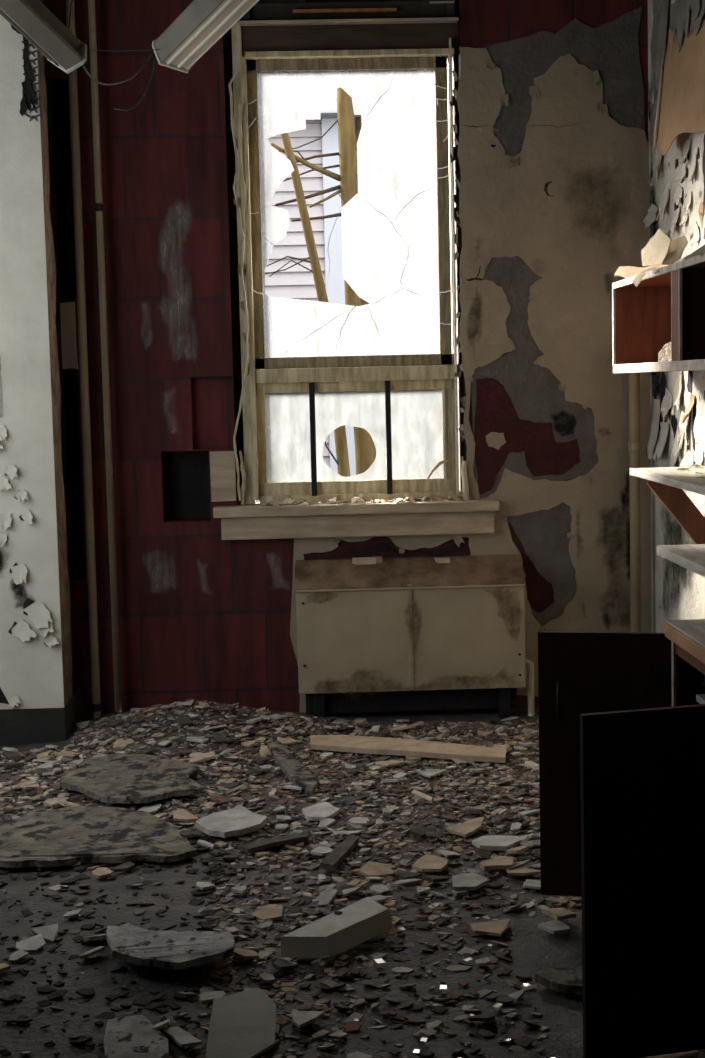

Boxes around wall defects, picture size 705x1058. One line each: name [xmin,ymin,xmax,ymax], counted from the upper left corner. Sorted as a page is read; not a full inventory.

peeling [450,55,461,106]
peeling [450,125,462,261]
peeling [479,0,705,287]
spalling [263,256,599,506]
spalling [503,502,576,631]